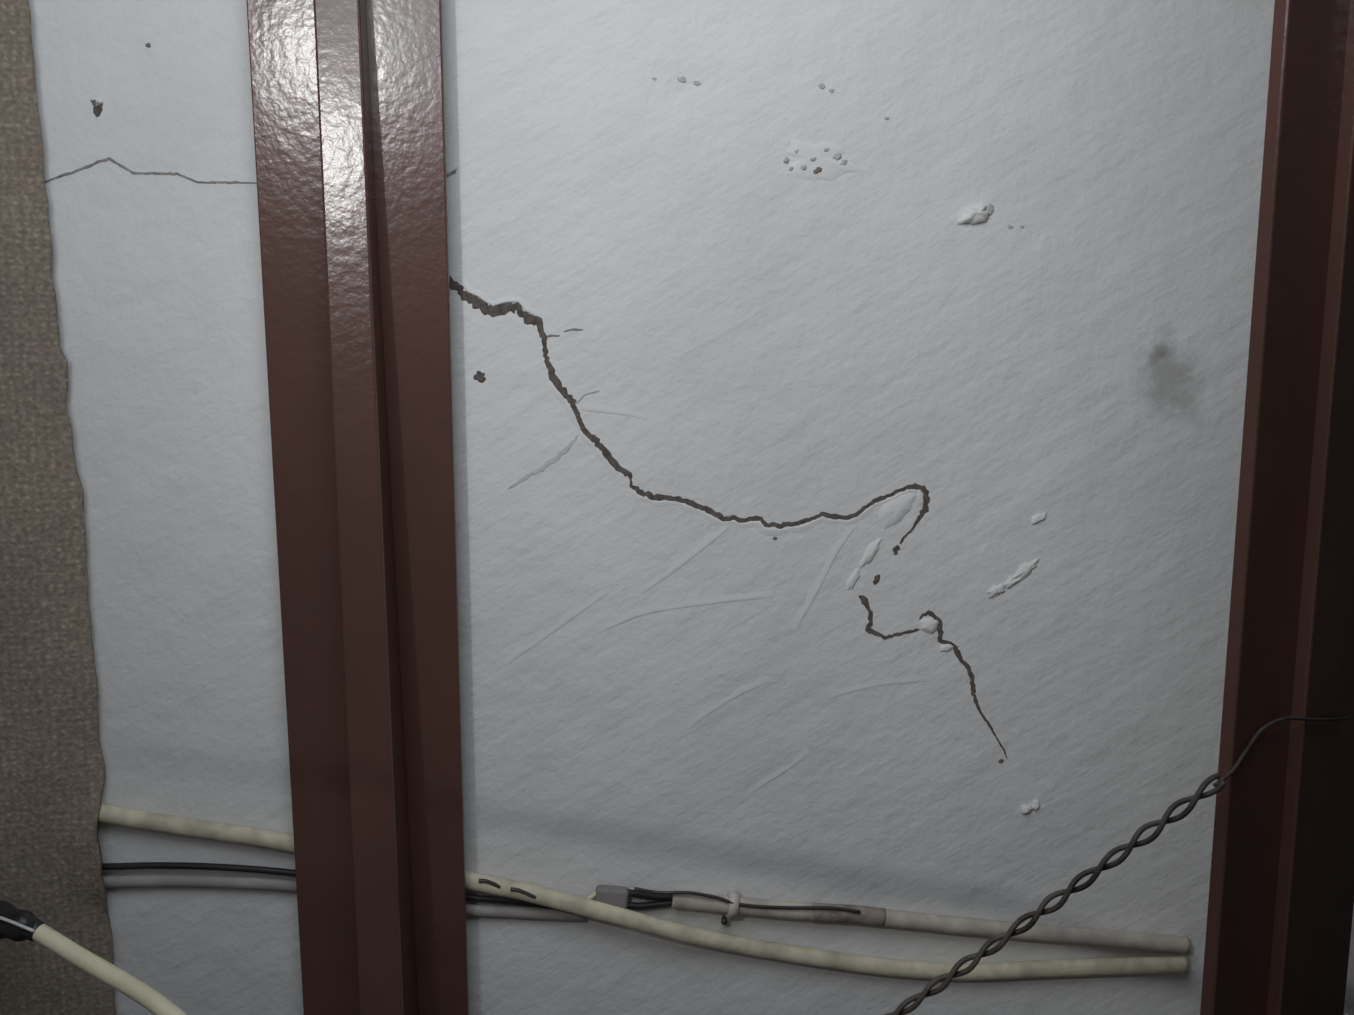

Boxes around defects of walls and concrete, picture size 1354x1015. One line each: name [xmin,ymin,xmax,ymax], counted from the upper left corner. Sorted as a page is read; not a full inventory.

crack [45,157,257,184]
crack [449,275,1007,758]